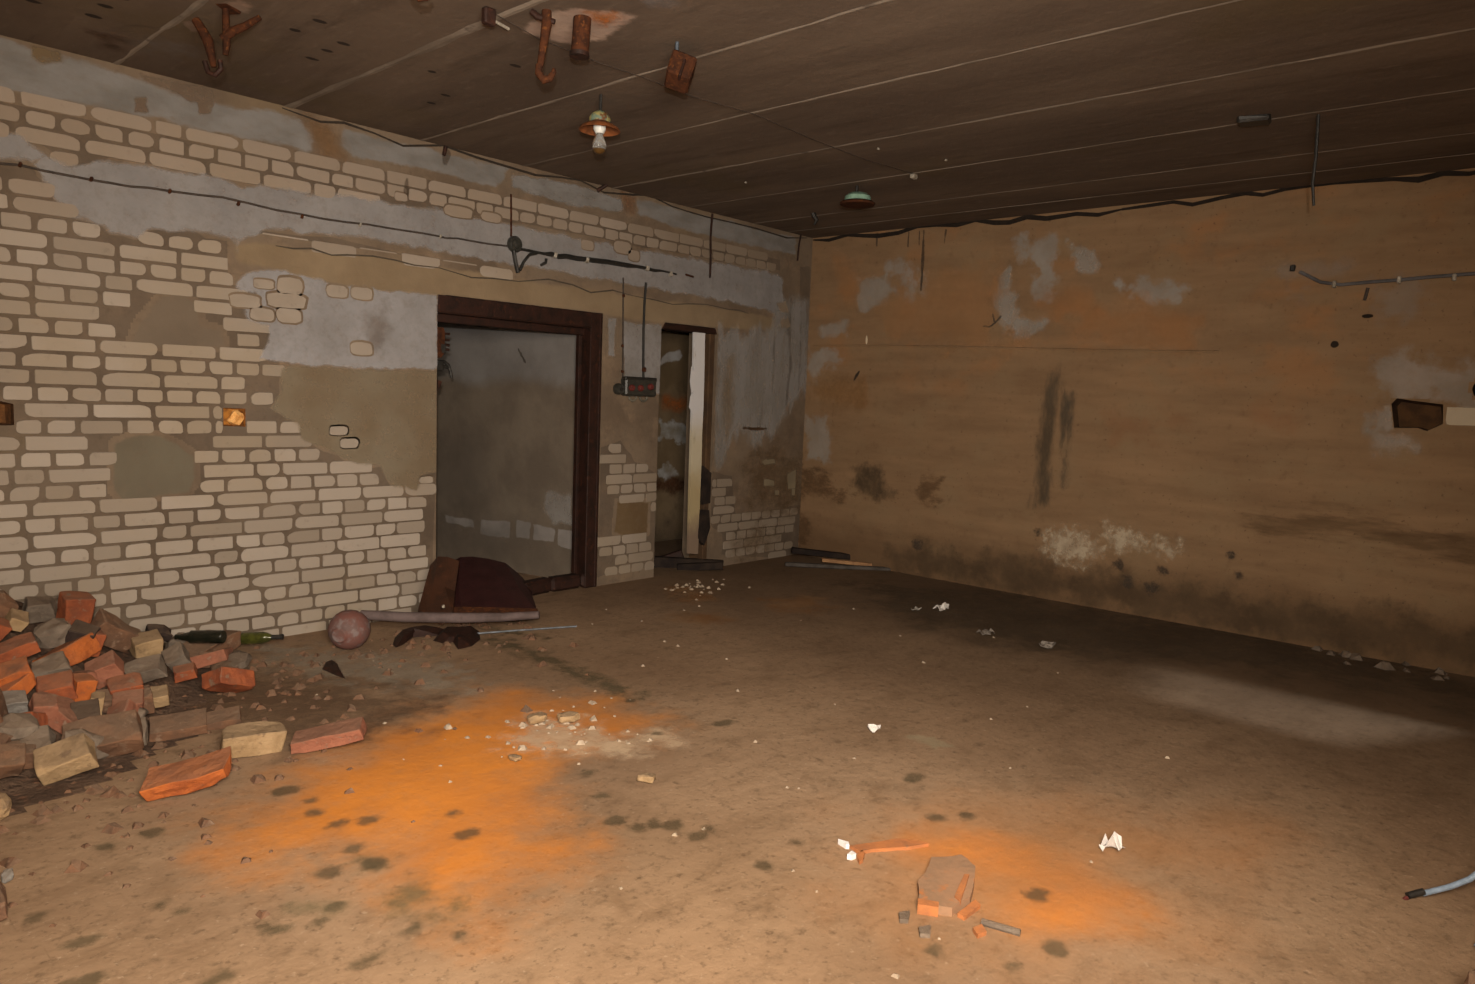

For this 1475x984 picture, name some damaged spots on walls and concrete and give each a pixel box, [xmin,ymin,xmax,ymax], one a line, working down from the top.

peeling [0,35,933,490]
water stain [733,353,1475,716]